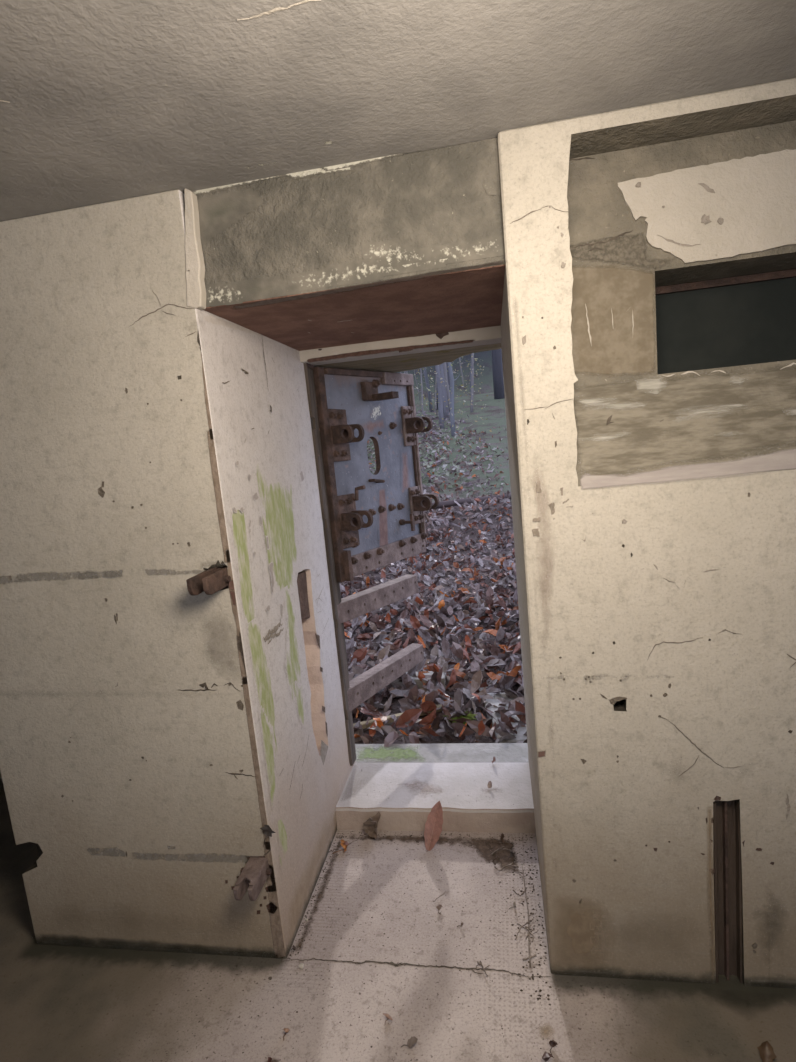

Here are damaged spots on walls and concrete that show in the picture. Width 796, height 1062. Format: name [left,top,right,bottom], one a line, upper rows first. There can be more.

water stain [482,145,501,196]
spalling [701,214,724,225]
water stain [286,236,504,292]
water stain [205,282,247,307]
crack [129,292,203,361]
rust [400,448,411,494]
crack [648,629,743,658]
spalling [320,706,328,765]
crack [661,717,740,776]
crack [281,958,551,977]